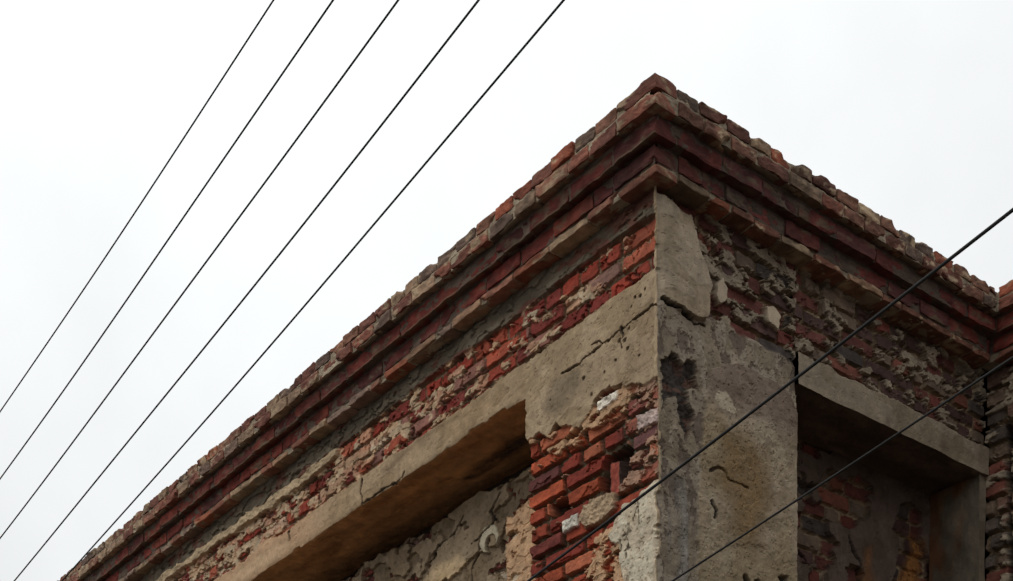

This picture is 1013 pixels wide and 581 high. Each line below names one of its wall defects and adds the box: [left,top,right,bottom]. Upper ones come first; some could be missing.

spalling [166,213,656,581]
crack [526,333,564,359]
peeling [349,353,874,581]
crack [561,295,706,374]